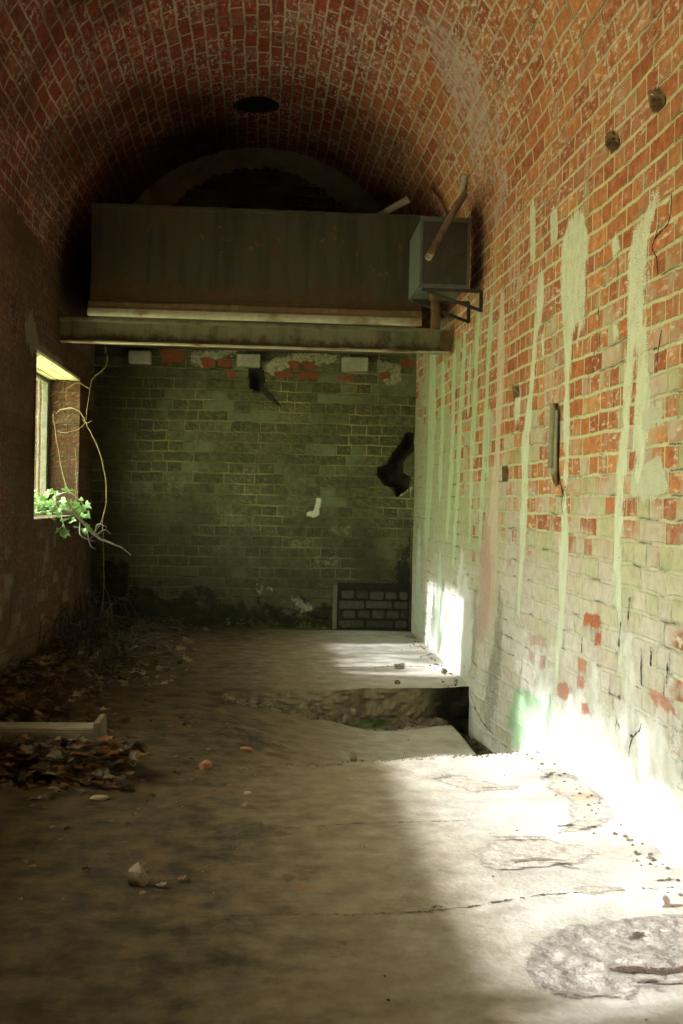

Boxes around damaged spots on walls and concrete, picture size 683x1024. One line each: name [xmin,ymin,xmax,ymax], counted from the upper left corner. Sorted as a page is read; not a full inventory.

crack [652,194,672,274]
peeling [159,349,337,407]
spalling [377,432,414,499]
leakage [392,269,546,733]
leakage [530,188,683,868]
leakage [92,557,333,628]
spalling [468,769,614,870]
spalling [521,913,683,1000]